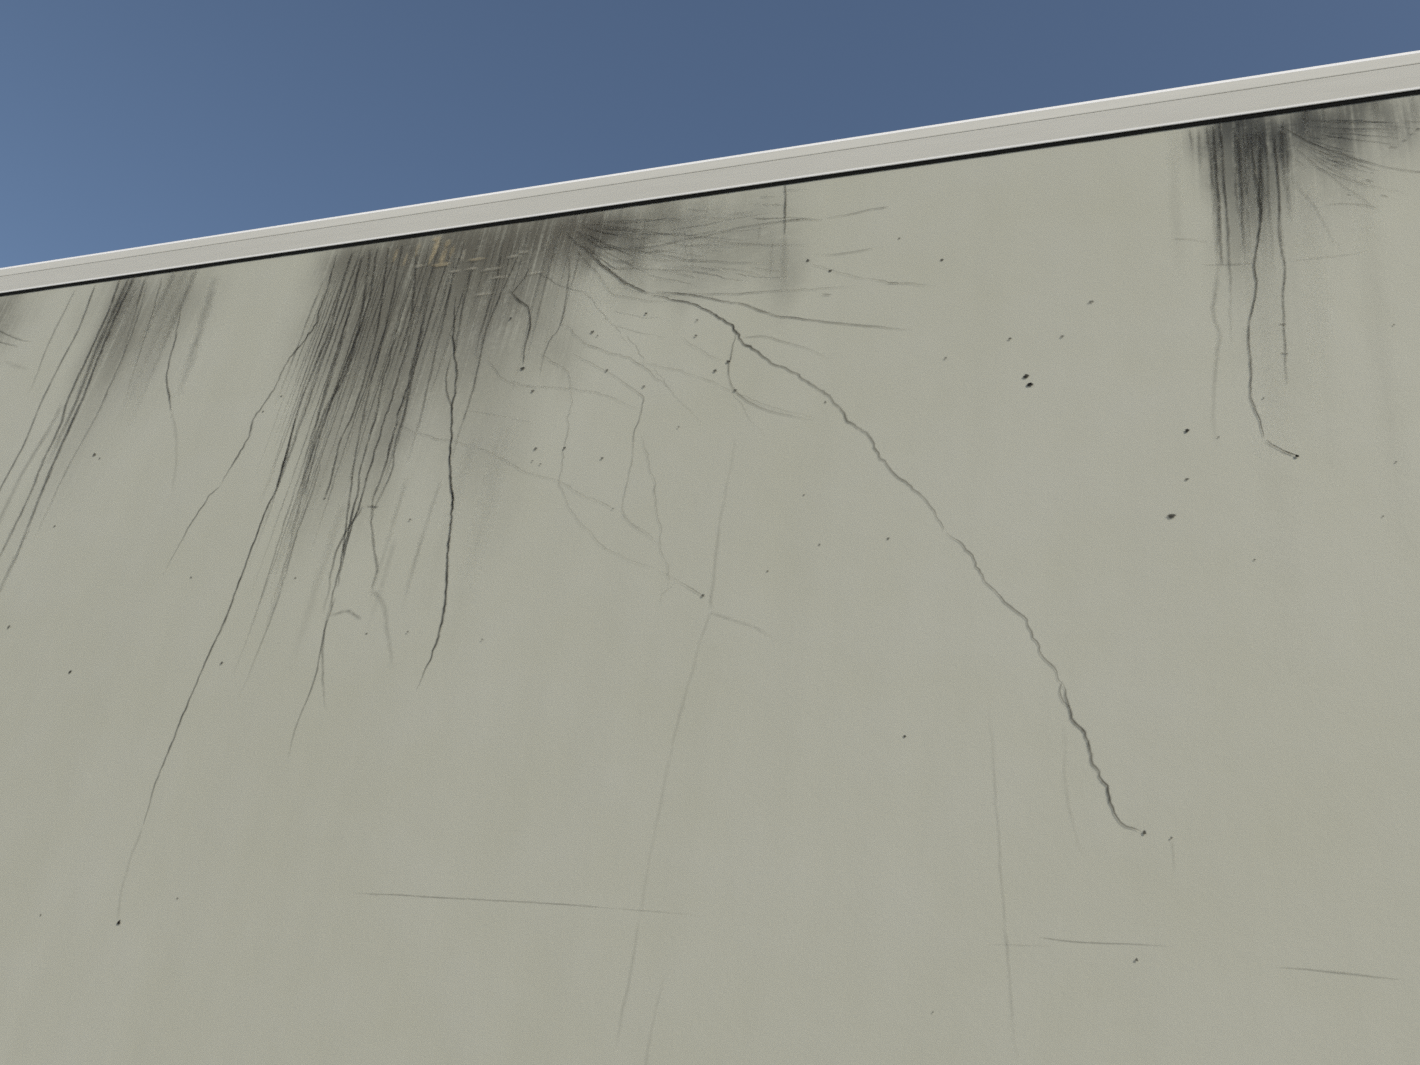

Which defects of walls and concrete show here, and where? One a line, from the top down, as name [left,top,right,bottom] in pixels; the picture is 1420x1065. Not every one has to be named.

damp [1213,109,1346,209]
damp [37,282,132,490]
damp [337,365,413,550]
damp [303,215,611,424]
crack [631,285,803,371]
crack [1065,692,1131,828]